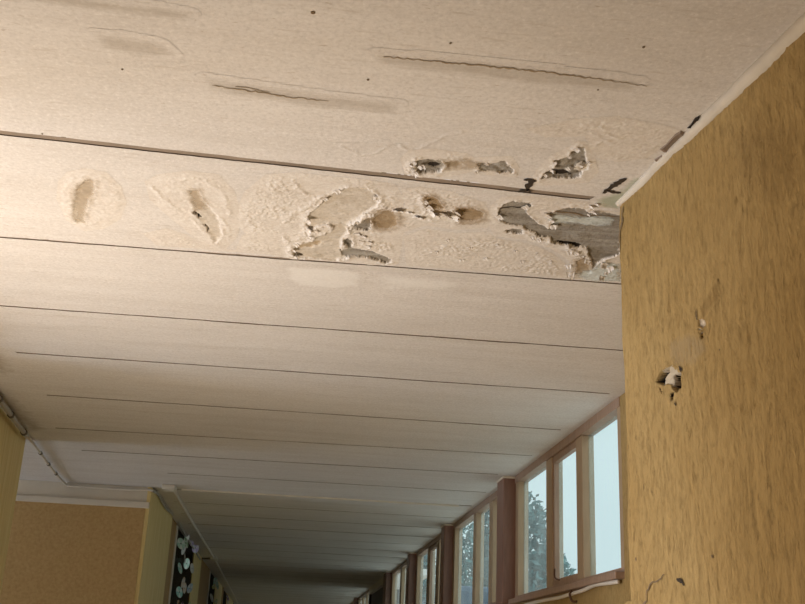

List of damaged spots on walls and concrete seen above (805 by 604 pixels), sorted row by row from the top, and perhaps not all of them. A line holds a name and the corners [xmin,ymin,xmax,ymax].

crack [390,57,647,87]
flaking render [400,148,519,178]
flaking render [532,140,599,186]
peeling [237,172,463,265]
flaking render [487,196,621,281]
spalling [648,357,692,410]